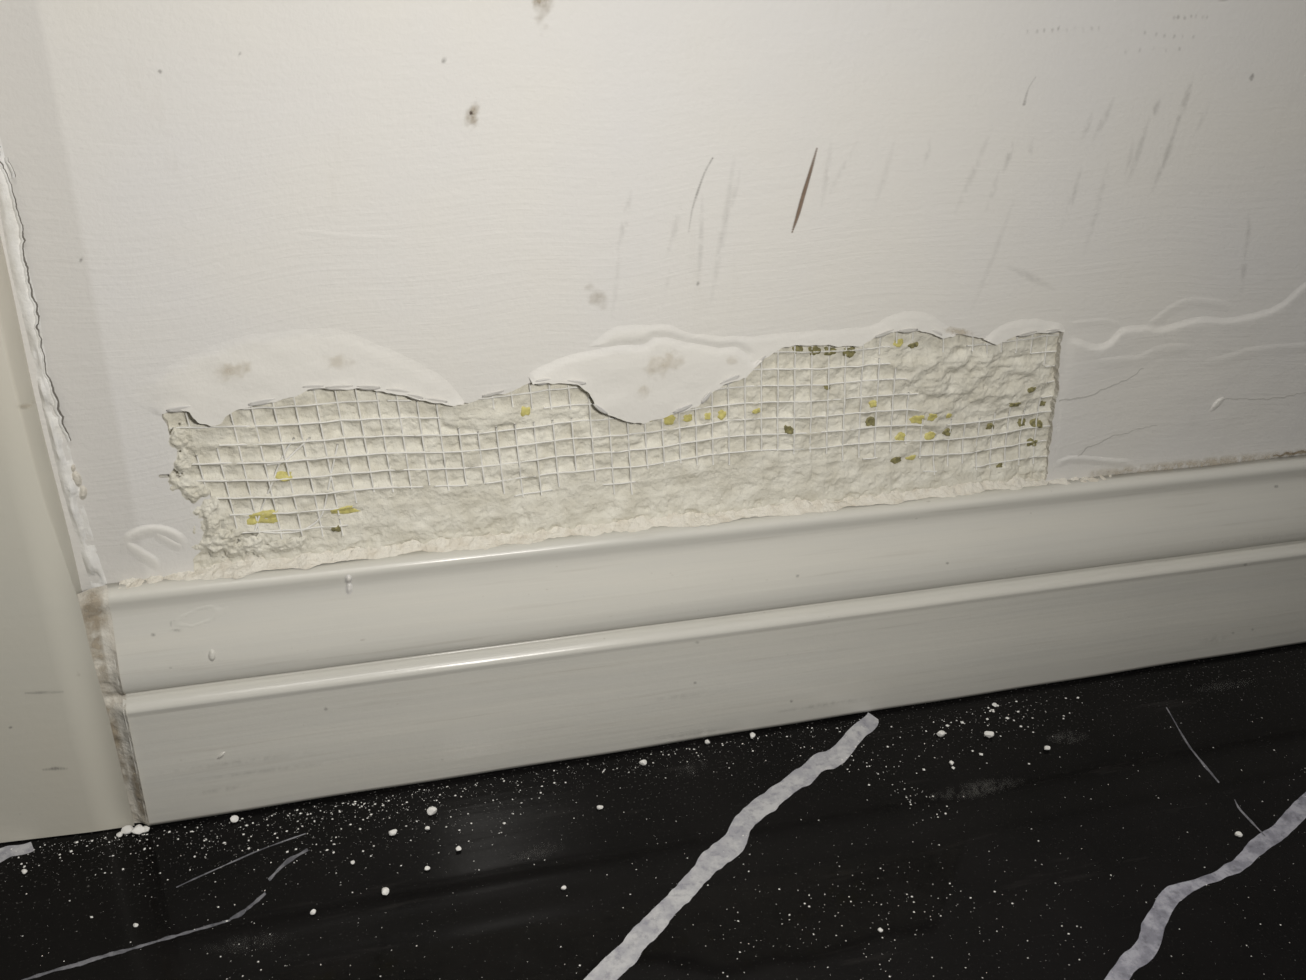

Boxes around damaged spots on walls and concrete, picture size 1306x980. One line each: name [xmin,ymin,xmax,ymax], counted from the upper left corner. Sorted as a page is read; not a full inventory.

crack [0,157,71,442]
spalling [163,282,1306,571]